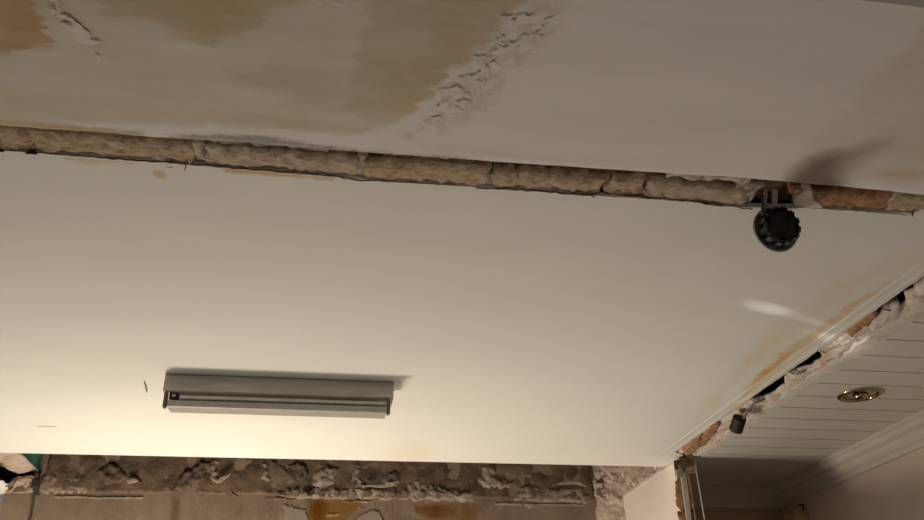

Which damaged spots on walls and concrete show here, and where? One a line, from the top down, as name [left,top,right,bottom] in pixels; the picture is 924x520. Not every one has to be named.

flaking render [0,125,924,215]
flaking render [0,276,924,520]